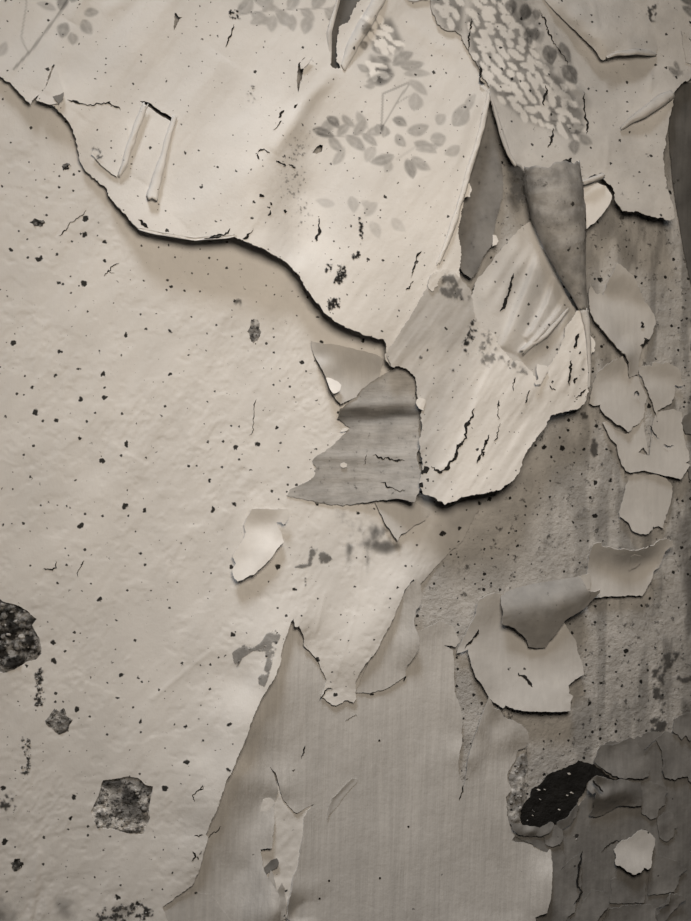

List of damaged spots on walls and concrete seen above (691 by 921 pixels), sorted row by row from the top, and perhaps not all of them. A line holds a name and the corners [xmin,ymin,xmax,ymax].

flaking render [0,77,485,921]
peeling [578,263,691,598]
peeling [163,593,691,921]